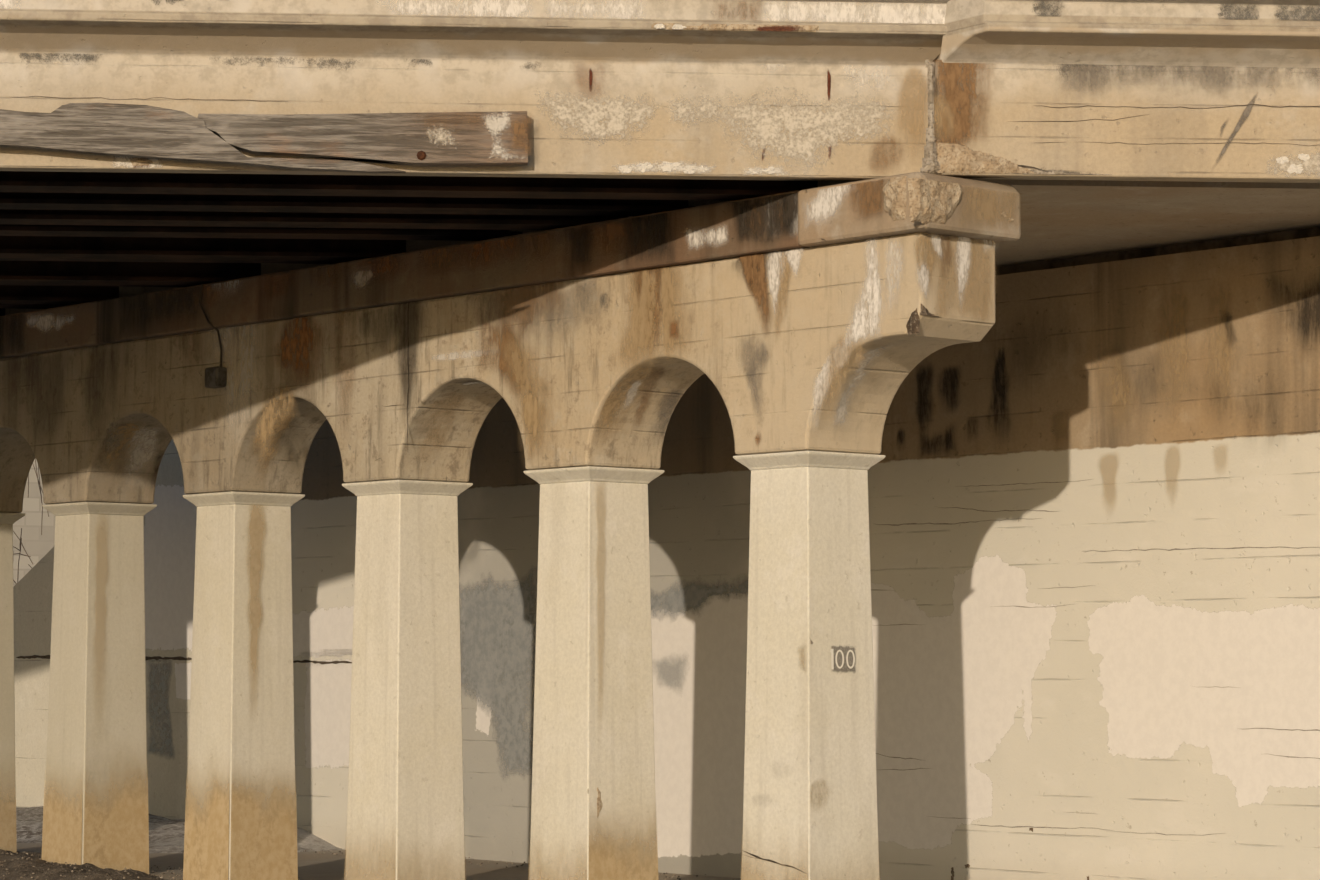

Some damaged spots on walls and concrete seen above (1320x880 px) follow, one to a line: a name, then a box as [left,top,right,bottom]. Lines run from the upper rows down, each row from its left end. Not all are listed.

peeling [541,93,654,140]
peeling [618,161,716,174]
peeling [673,94,893,176]
spalling [882,60,1108,224]
crack [1008,99,1320,156]
damp [688,179,883,323]
damp [915,235,991,292]
damp [814,238,899,408]
corrosion [255,391,292,460]
damp [917,369,958,452]
damp [994,354,1007,423]
corrosion [250,506,263,669]